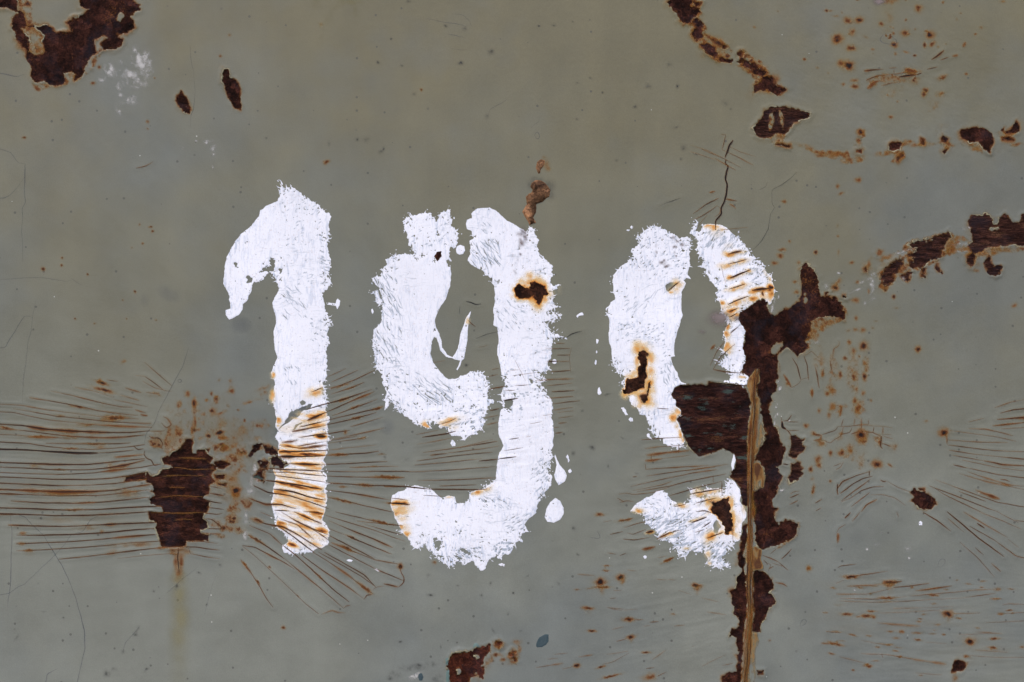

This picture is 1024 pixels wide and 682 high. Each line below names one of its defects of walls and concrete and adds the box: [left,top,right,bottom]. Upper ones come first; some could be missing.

corrosion [0,0,141,91]
corrosion [175,90,191,114]
corrosion [219,55,242,111]
corrosion [667,0,812,148]
corrosion [940,120,1020,154]
corrosion [850,212,1024,299]
corrosion [512,273,549,309]
corrosion [622,343,654,407]
corrosion [124,391,351,575]
corrosion [669,251,880,682]
corrosion [911,488,937,511]
corrosion [445,641,517,682]